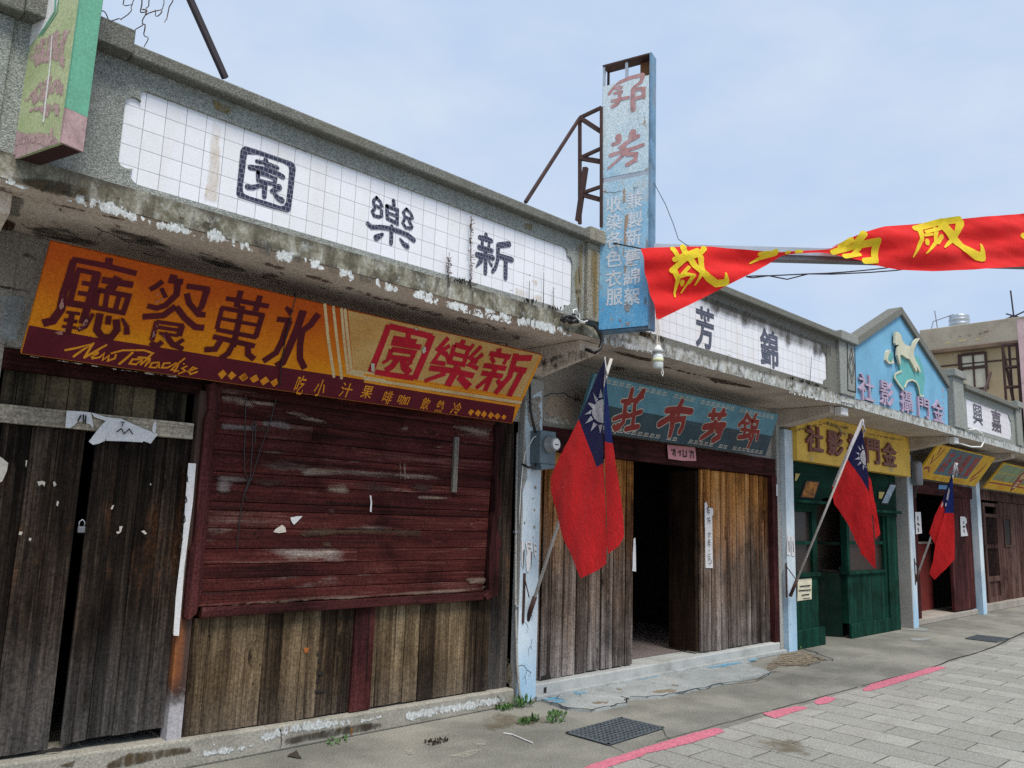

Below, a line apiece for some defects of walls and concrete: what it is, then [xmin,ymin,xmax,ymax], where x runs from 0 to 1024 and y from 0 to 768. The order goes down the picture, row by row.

peeling [51,194,253,251]
peeling [405,659,512,721]
crack [551,648,833,710]
peeling [197,715,382,757]